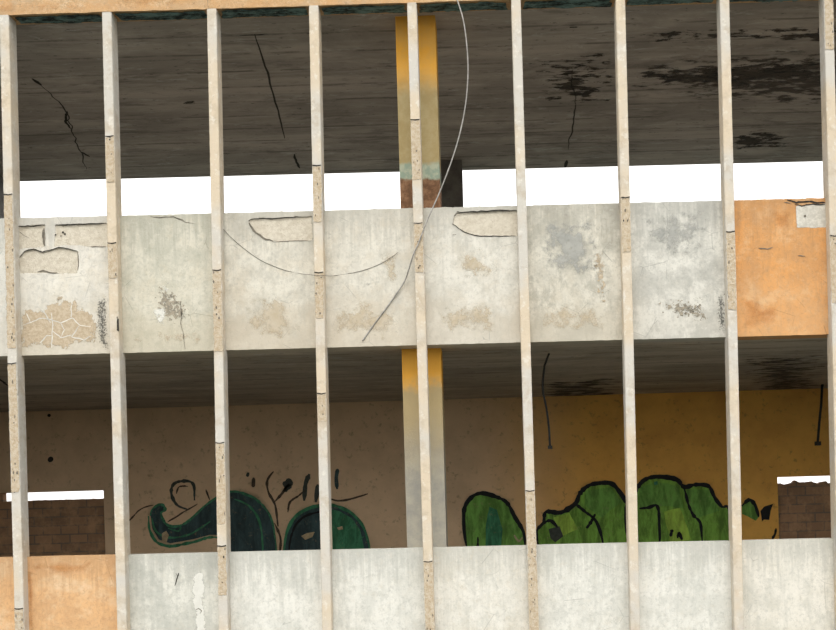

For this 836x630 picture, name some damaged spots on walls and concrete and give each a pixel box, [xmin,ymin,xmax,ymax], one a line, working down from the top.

damp [730,27,819,41]
crack [32,78,90,169]
crack [240,34,300,168]
crack [557,69,588,167]
damp [537,53,613,101]
damp [633,59,718,98]
damp [734,130,787,149]
damp [731,51,821,104]
spalling [249,165,322,242]
spalling [453,210,518,237]
peeling [3,194,118,349]
peeling [659,300,706,320]